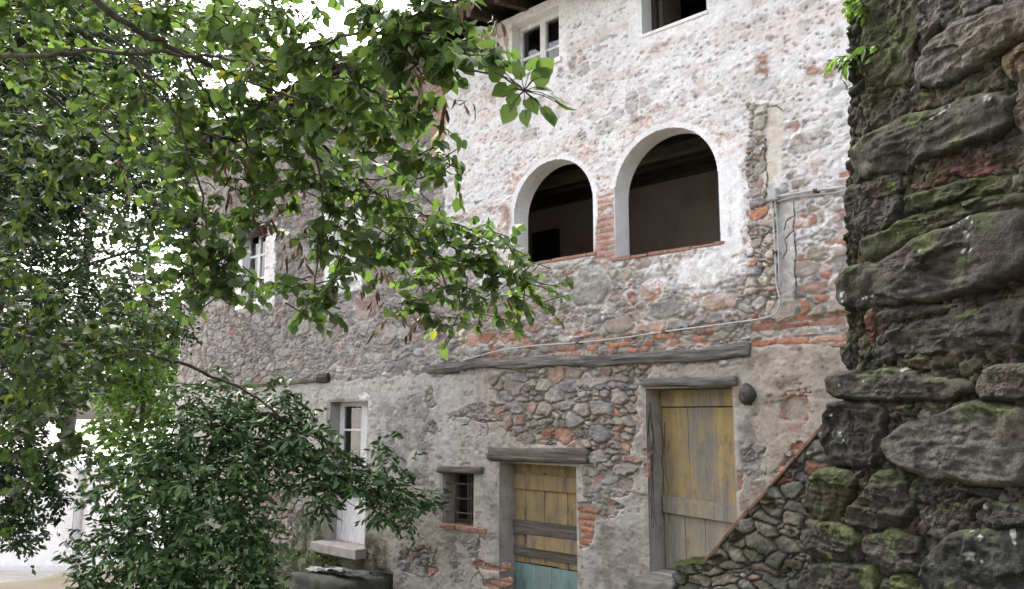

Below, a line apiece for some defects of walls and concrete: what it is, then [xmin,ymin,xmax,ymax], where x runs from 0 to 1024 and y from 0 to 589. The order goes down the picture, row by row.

flaking render [427,102,849,549]
flaking render [397,539,515,589]